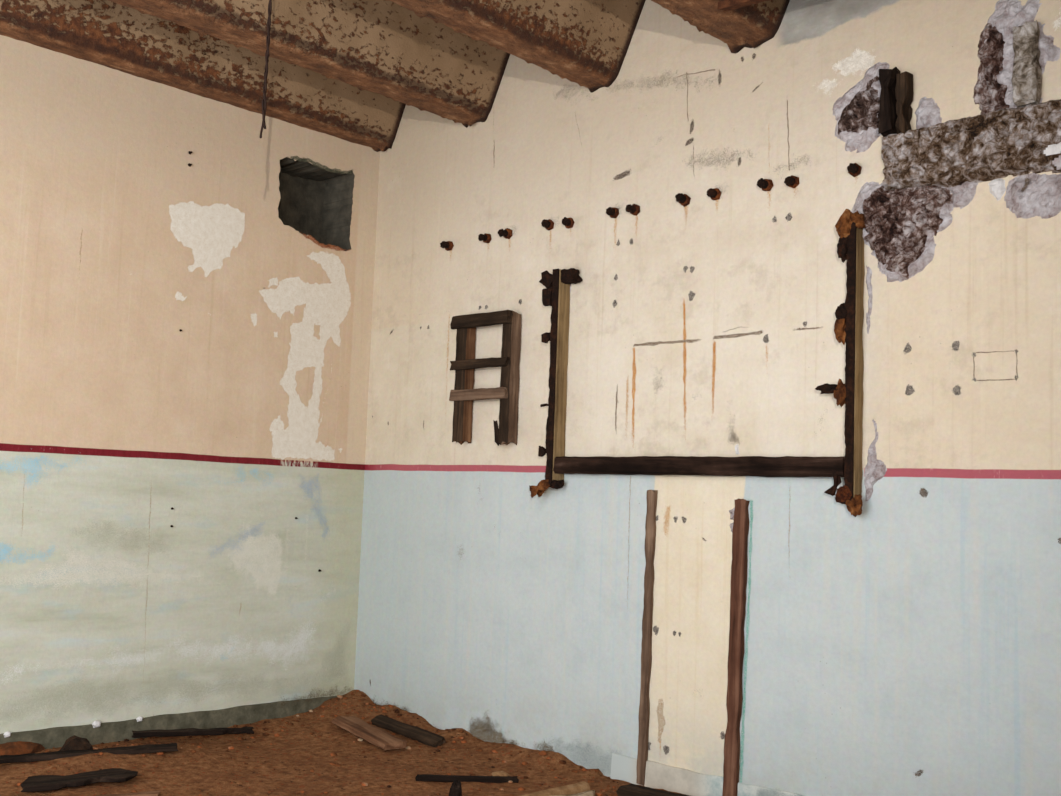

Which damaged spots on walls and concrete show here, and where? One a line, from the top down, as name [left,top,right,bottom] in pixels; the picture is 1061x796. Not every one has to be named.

spalling [813,47,890,153]
spalling [914,97,942,129]
spalling [973,0,1061,115]
peeling [169,201,245,277]
spalling [851,142,1061,334]
peeling [259,156,355,461]
corrosion [625,348,637,446]
spalling [864,419,887,501]